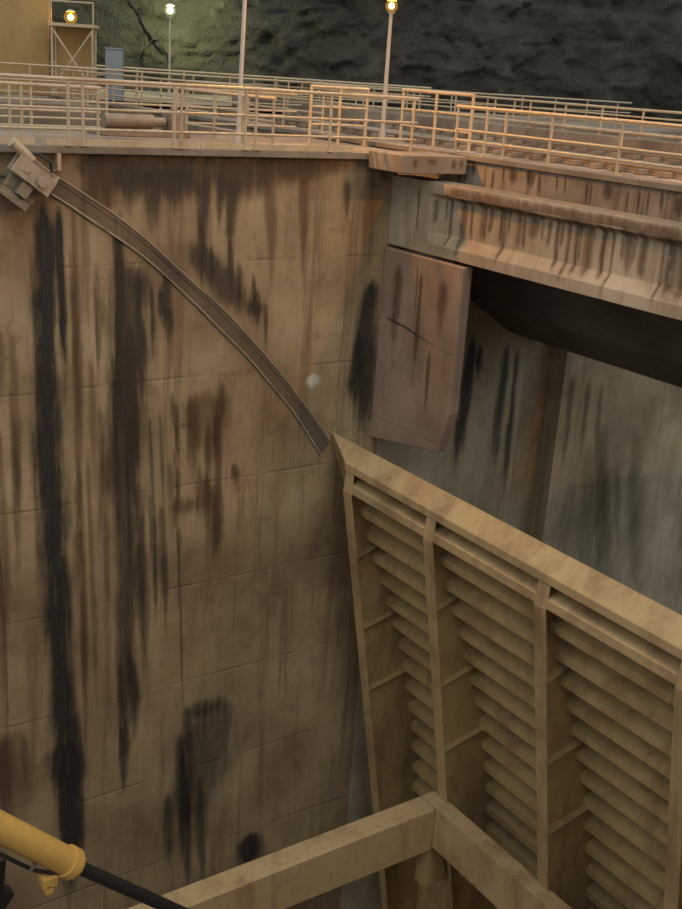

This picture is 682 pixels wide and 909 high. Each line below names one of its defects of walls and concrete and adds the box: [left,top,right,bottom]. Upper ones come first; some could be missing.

damp [435,162,682,295]
damp [348,282,378,420]
damp [455,340,482,454]
damp [496,349,518,465]
damp [32,206,84,849]